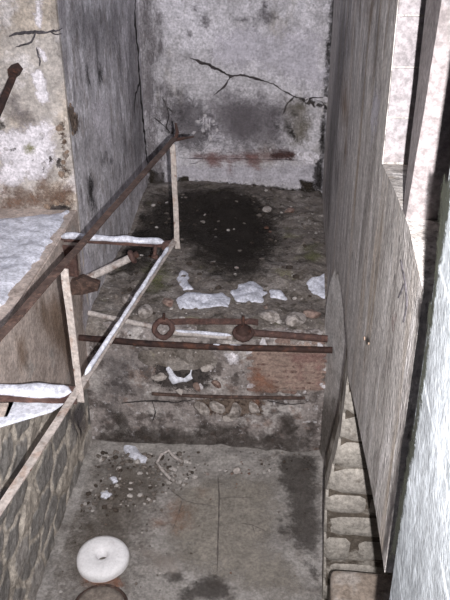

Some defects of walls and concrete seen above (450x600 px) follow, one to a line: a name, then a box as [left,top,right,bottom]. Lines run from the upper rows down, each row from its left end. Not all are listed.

crack [9,28,63,66]
crack [134,0,183,161]
crack [190,58,323,116]
rust [161,318,258,326]
water stain [102,414,319,550]